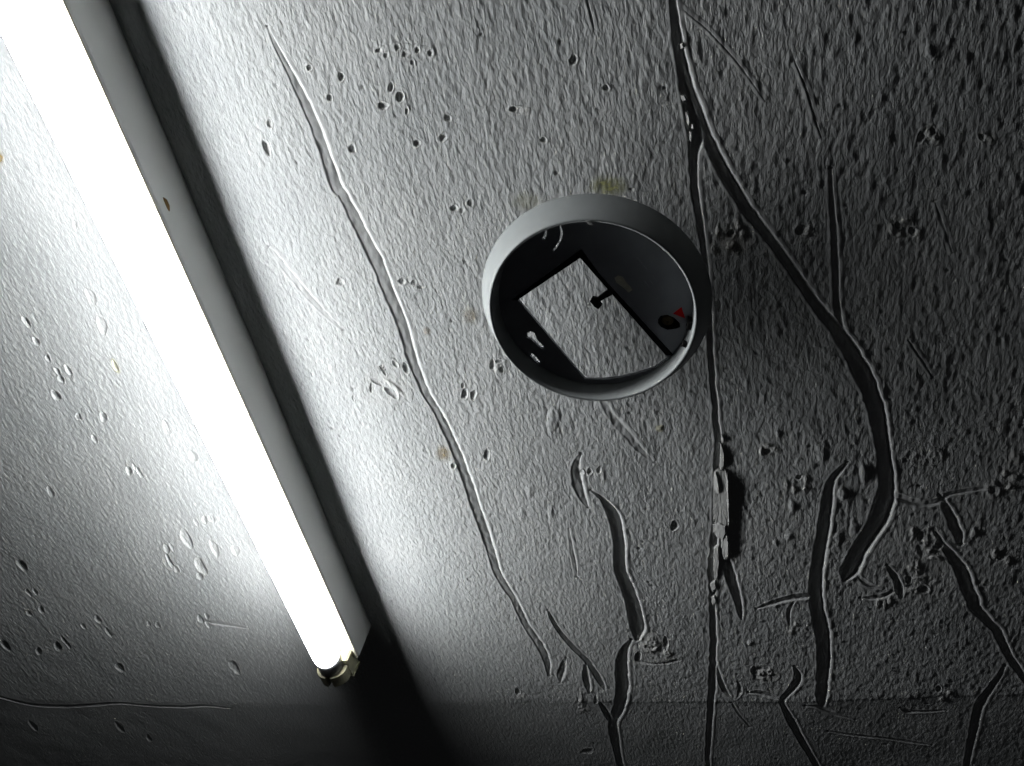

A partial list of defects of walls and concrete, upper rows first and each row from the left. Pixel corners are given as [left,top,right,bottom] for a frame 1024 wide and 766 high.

crack [265,26,656,766]
crack [583,0,598,30]
spalling [710,434,729,606]
crack [666,0,1024,766]